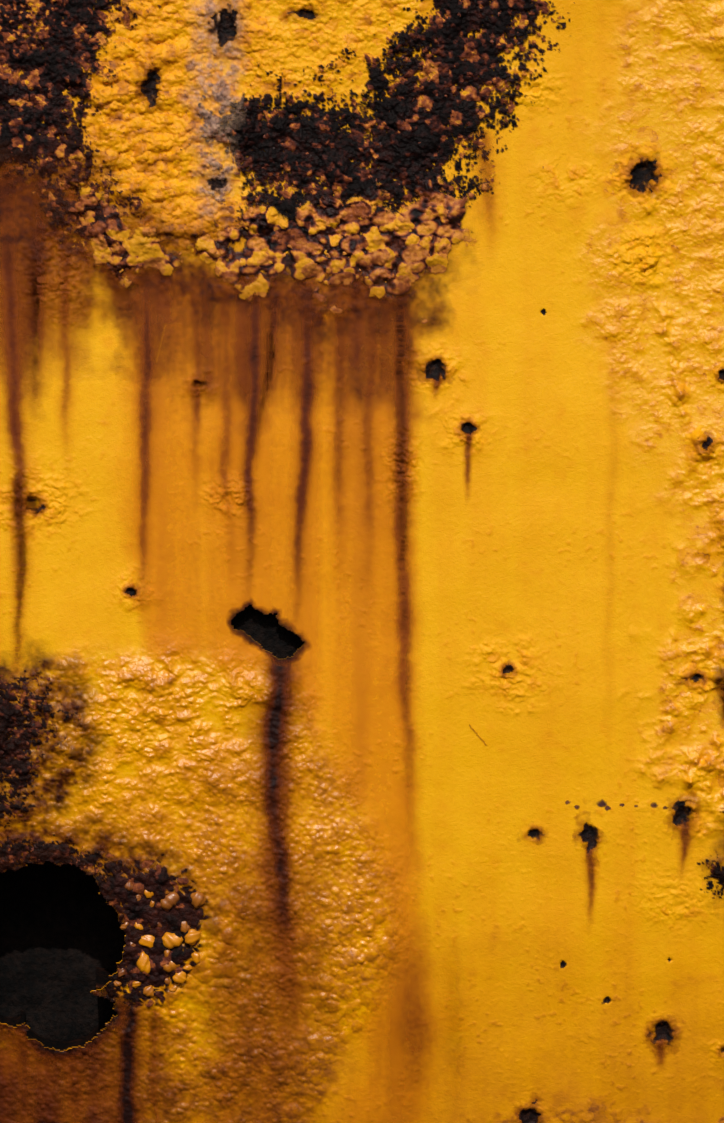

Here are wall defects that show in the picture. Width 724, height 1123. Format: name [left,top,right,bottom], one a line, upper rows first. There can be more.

corrosion [198,0,570,224]
corrosion [0,0,430,1123]
corrosion [697,854,724,898]
spalling [498,1088,560,1123]